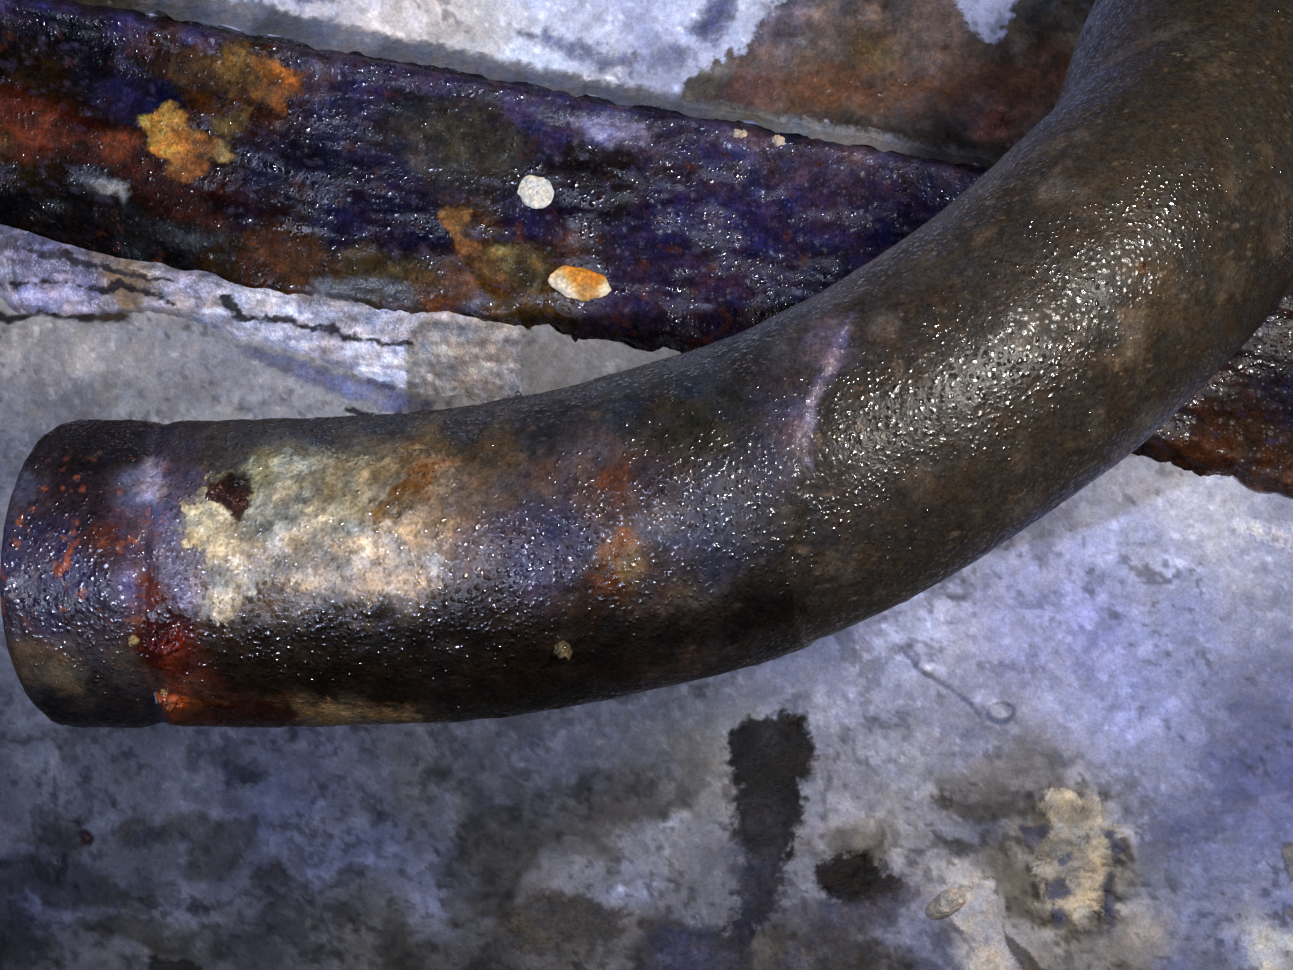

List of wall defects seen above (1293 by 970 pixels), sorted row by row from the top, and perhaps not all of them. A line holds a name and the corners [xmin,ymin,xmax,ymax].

rust [682,0,1095,166]
rust [0,42,552,301]
rust [208,471,254,521]
rust [369,454,457,532]
rust [1237,468,1293,500]
rust [588,532,640,598]
rust [136,574,196,676]
rust [163,692,297,728]
damp [650,709,816,970]
damp [779,936,876,970]